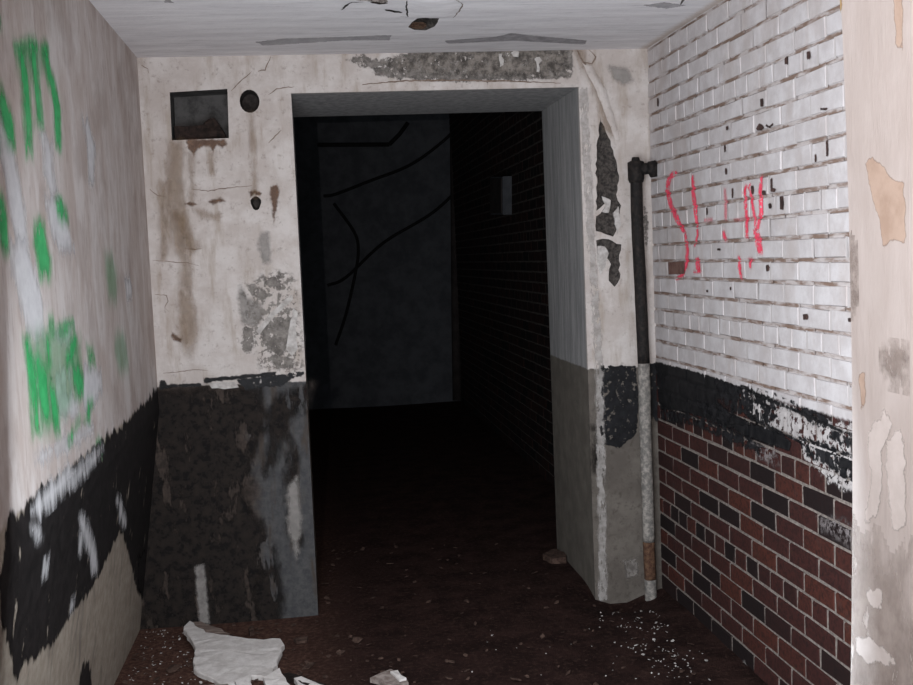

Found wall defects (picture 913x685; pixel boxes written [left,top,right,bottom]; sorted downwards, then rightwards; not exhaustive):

peeling [257,35,391,45]
flaking render [351,33,586,83]
flaking render [259,233,269,262]
peeling [668,261,684,274]
peeling [751,178,784,210]
peeling [866,157,906,246]
flaking render [579,88,639,601]
peeling [0,272,304,685]
leakage [140,381,314,629]
peeling [650,362,852,492]
peeling [865,409,906,531]
peeling [850,531,913,685]